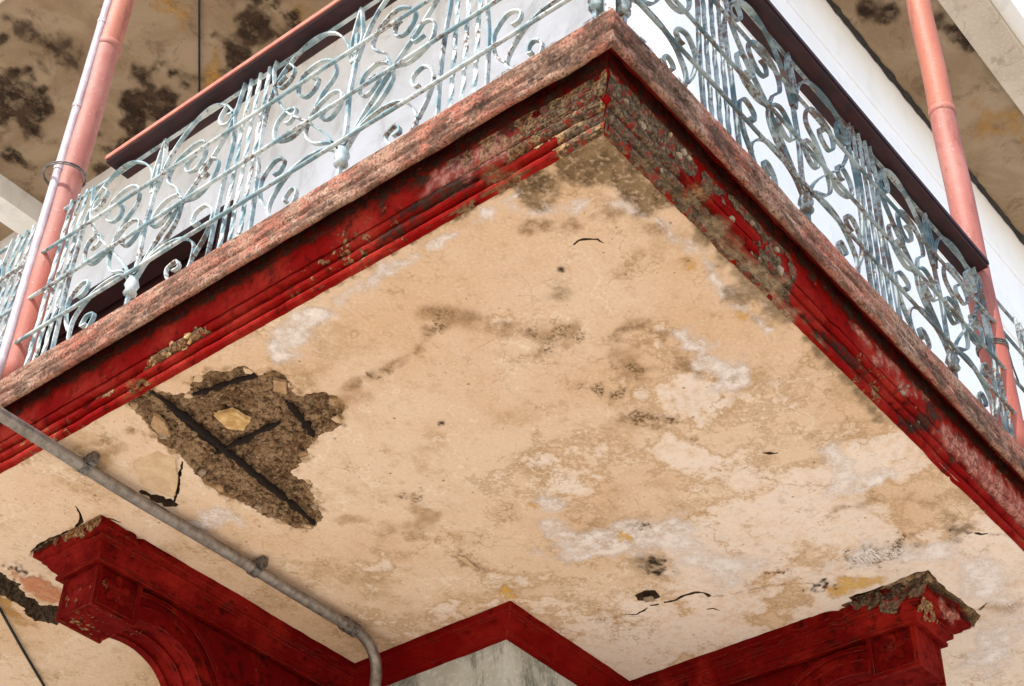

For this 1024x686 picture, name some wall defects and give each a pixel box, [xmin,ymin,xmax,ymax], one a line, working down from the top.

mould [0,16,77,68]
mould [0,67,54,137]
mould [103,63,189,152]
mould [1,148,28,168]
peeling [451,68,797,308]
damp [268,137,796,363]
damp [660,330,750,393]
spalling [127,326,345,531]
damp [535,497,765,588]
peeling [12,572,61,603]
crack [591,591,721,620]
flaking render [826,570,990,627]